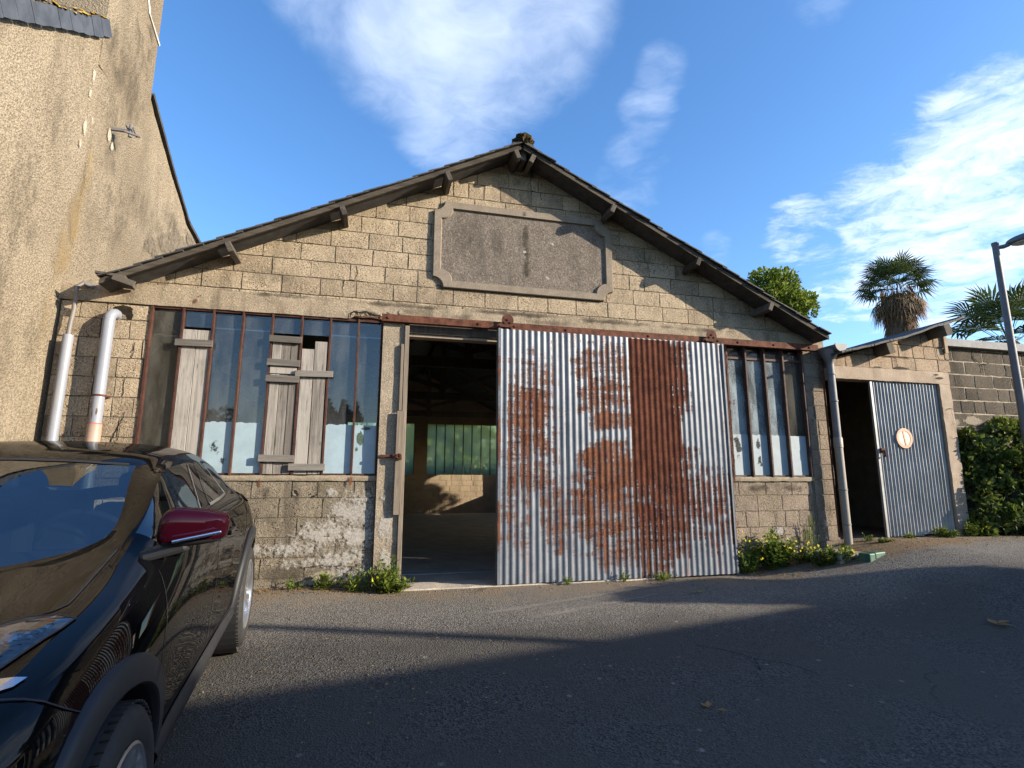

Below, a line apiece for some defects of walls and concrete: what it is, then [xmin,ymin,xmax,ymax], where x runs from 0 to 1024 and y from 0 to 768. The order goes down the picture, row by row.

peeling [253,488,392,585]
rust [497,338,739,578]